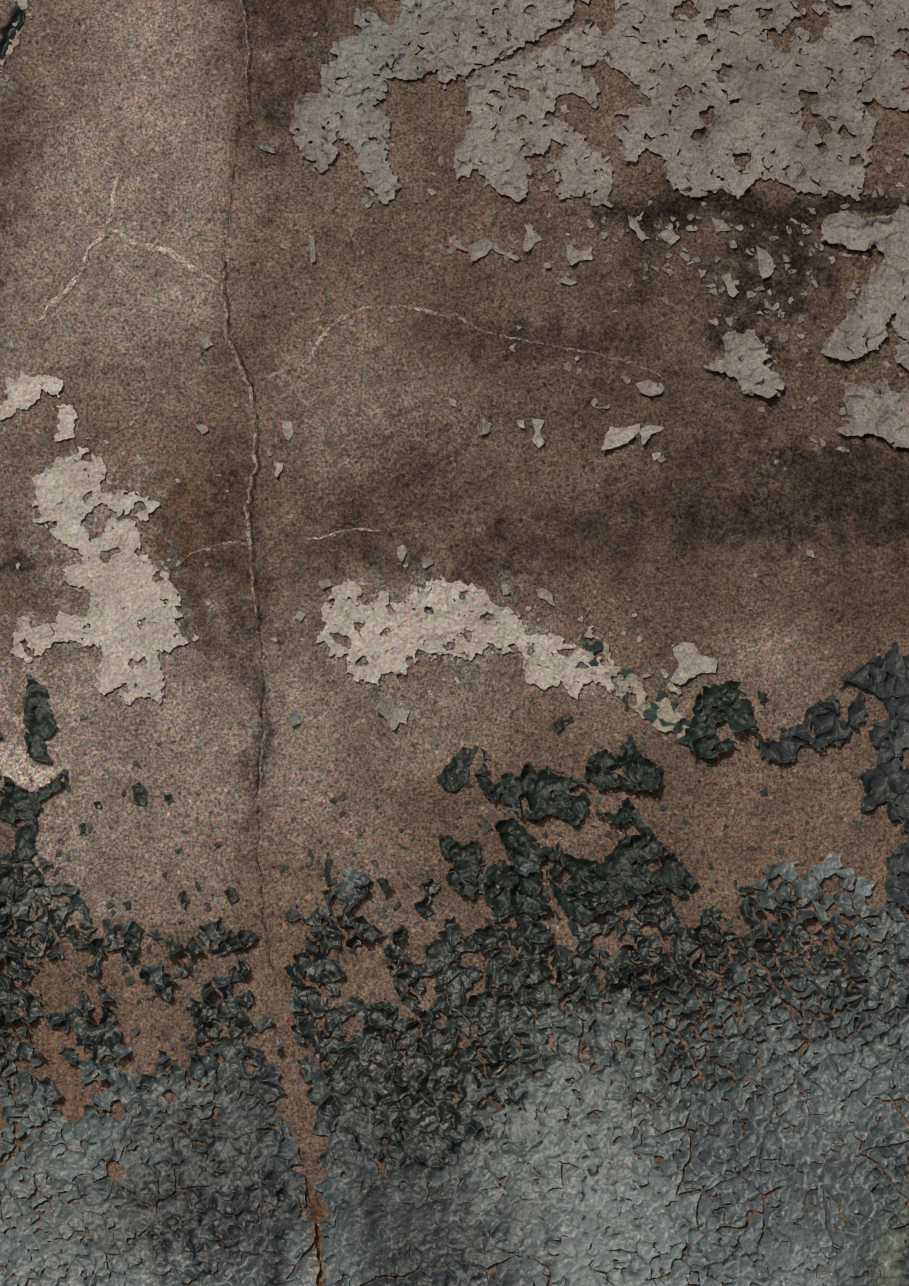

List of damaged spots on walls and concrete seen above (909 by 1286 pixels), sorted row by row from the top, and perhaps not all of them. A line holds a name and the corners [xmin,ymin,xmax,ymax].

spalling [0,6,32,72]
crack [237,0,253,136]
peeling [289,0,909,371]
peeling [703,329,785,399]
crack [36,170,585,970]
peeling [0,371,909,1286]
crack [305,1194,327,1286]